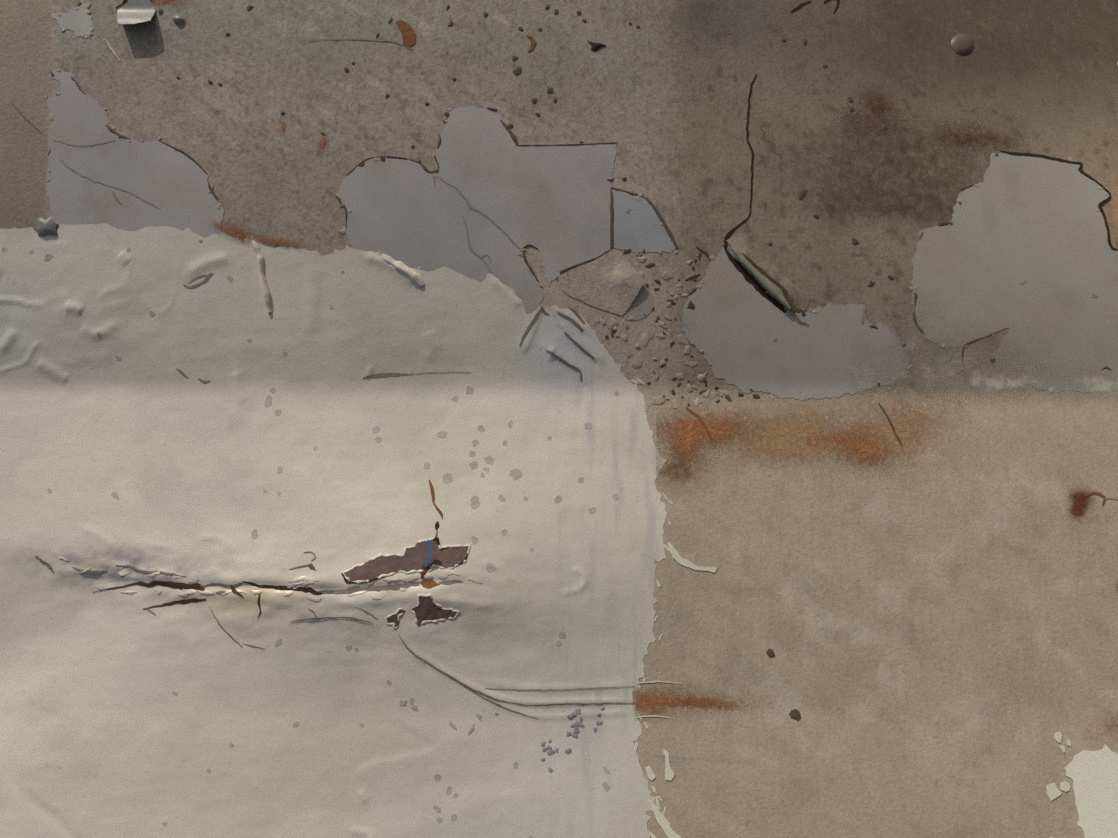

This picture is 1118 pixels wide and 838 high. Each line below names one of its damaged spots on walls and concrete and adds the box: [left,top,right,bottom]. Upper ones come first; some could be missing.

peeling [45,68,224,243]
rust [216,223,300,246]
peeling [336,106,912,409]
crack [723,74,805,314]
peeling [910,152,1118,393]
rust [664,406,928,478]
crack [429,480,443,537]
rust [1070,492,1106,516]
crack [35,551,482,649]
rust [632,680,733,718]